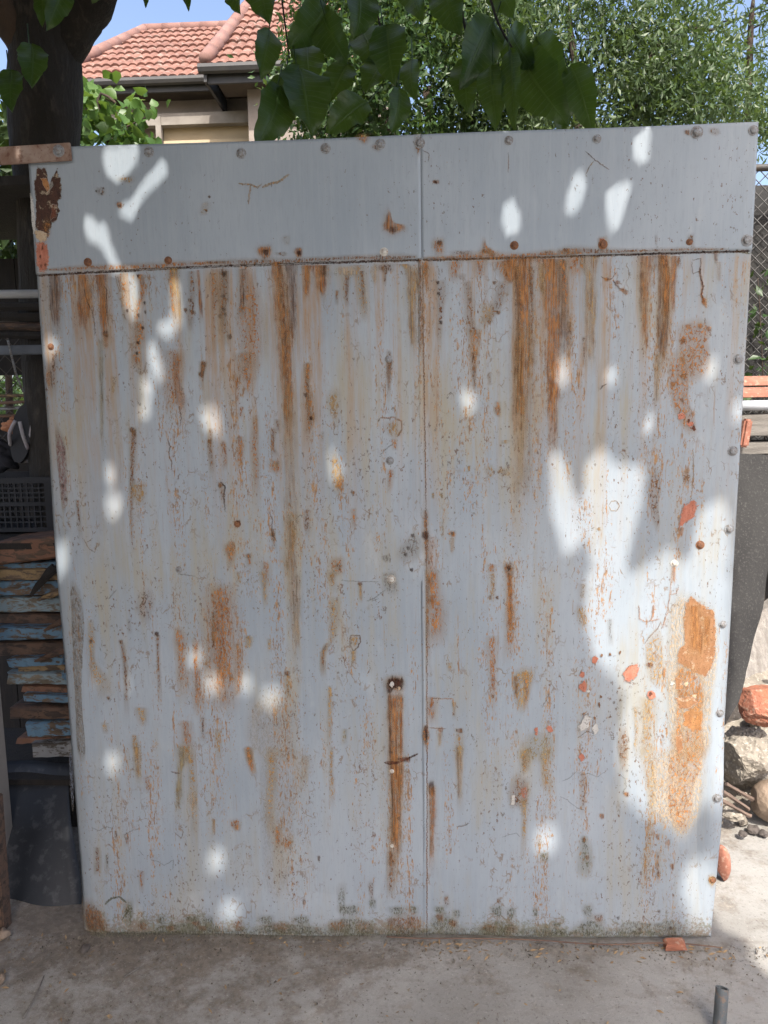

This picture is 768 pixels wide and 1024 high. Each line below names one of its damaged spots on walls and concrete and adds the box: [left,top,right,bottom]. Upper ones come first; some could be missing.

peeling [30,166,62,273]
rust [384,214,403,234]
rust [37,236,749,509]
peeling [678,500,699,535]
rust [207,588,250,692]
rust [388,695,403,890]
rust [423,512,454,932]
rust [489,564,515,698]
peeling [623,663,640,682]
rust [634,599,718,877]